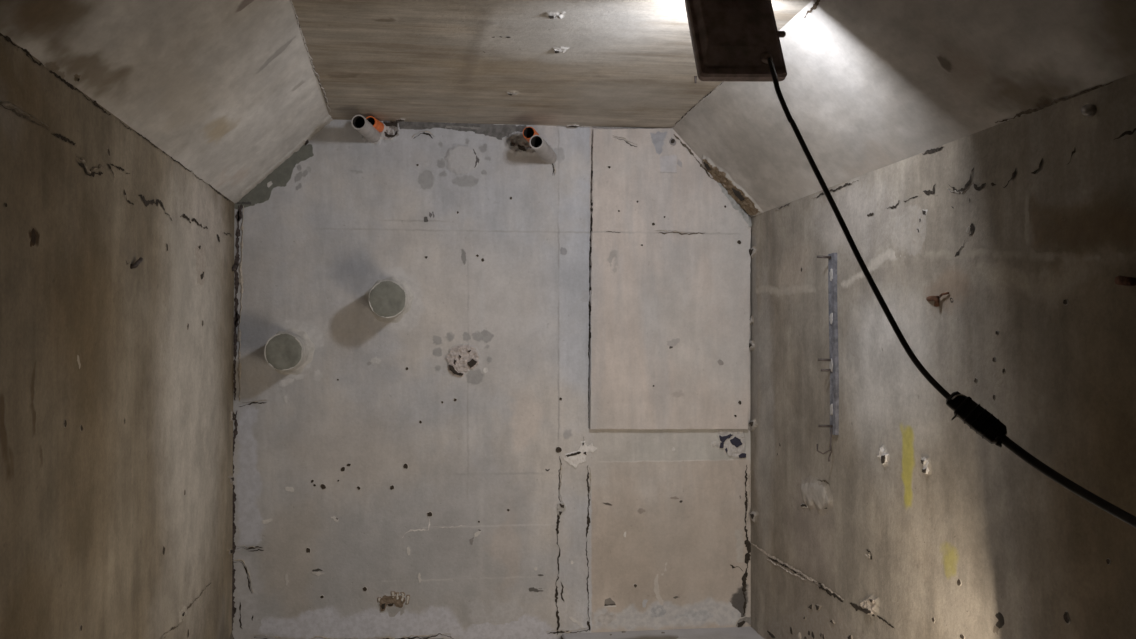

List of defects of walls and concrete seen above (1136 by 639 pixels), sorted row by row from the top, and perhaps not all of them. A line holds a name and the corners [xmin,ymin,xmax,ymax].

crack [1114,128,1136,140]
spalling [702,155,789,216]
crack [867,148,1076,216]
rust [913,260,988,333]
spalling [444,343,489,377]
spalling [544,441,598,472]
spalling [711,418,758,460]
water stain [213,397,762,639]
crack [547,437,592,635]
crack [731,465,751,615]
spalling [377,591,410,613]
spalling [859,593,881,619]